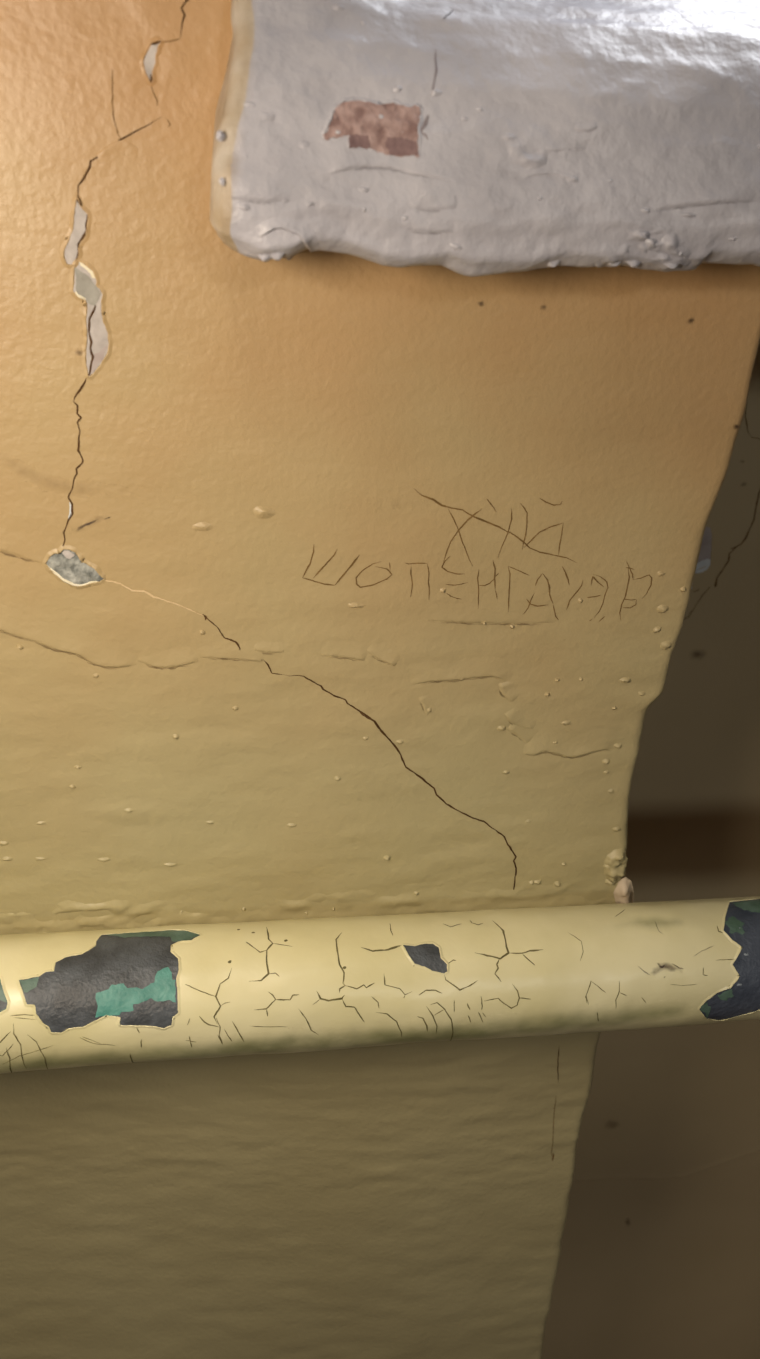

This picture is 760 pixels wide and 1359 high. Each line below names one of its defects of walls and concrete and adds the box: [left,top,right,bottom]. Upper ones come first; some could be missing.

crack [77,70,171,196]
spalling [139,36,165,103]
crack [163,0,188,42]
peeling [321,97,424,160]
crack [420,9,454,140]
peeling [60,193,113,381]
crack [63,379,86,546]
spalling [42,545,107,590]
peeling [691,525,714,589]
crack [684,490,760,619]
crack [106,580,517,890]